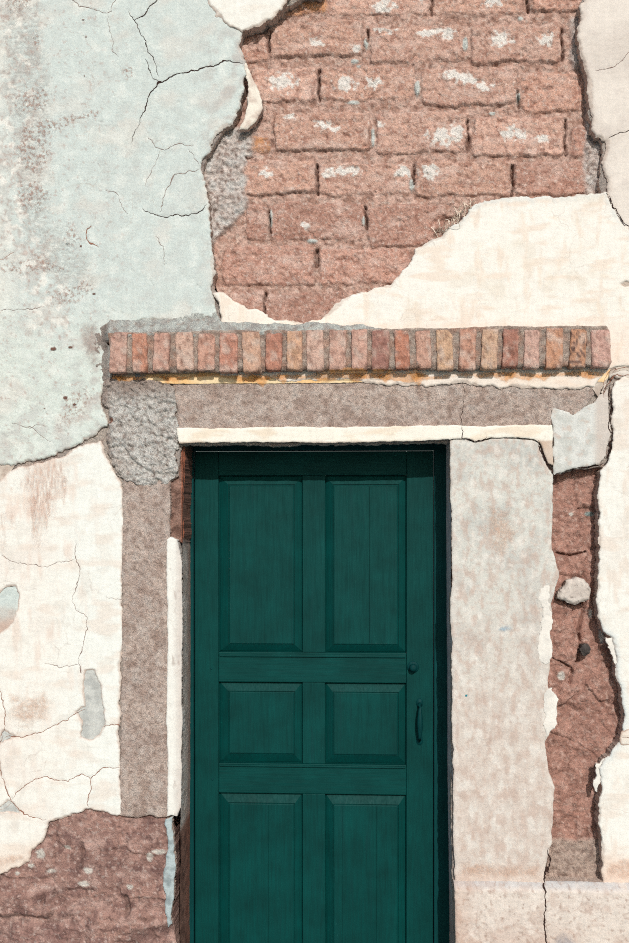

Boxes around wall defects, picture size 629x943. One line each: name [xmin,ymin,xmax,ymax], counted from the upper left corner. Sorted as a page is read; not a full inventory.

crack [73,0,240,256]
spalling [204,0,600,324]
peeling [0,586,19,633]
crack [0,691,82,742]
peeling [77,670,105,739]
spalling [537,468,620,878]
peeling [0,801,19,813]
crack [0,767,119,820]
spalling [0,809,181,943]
crack [543,850,551,943]